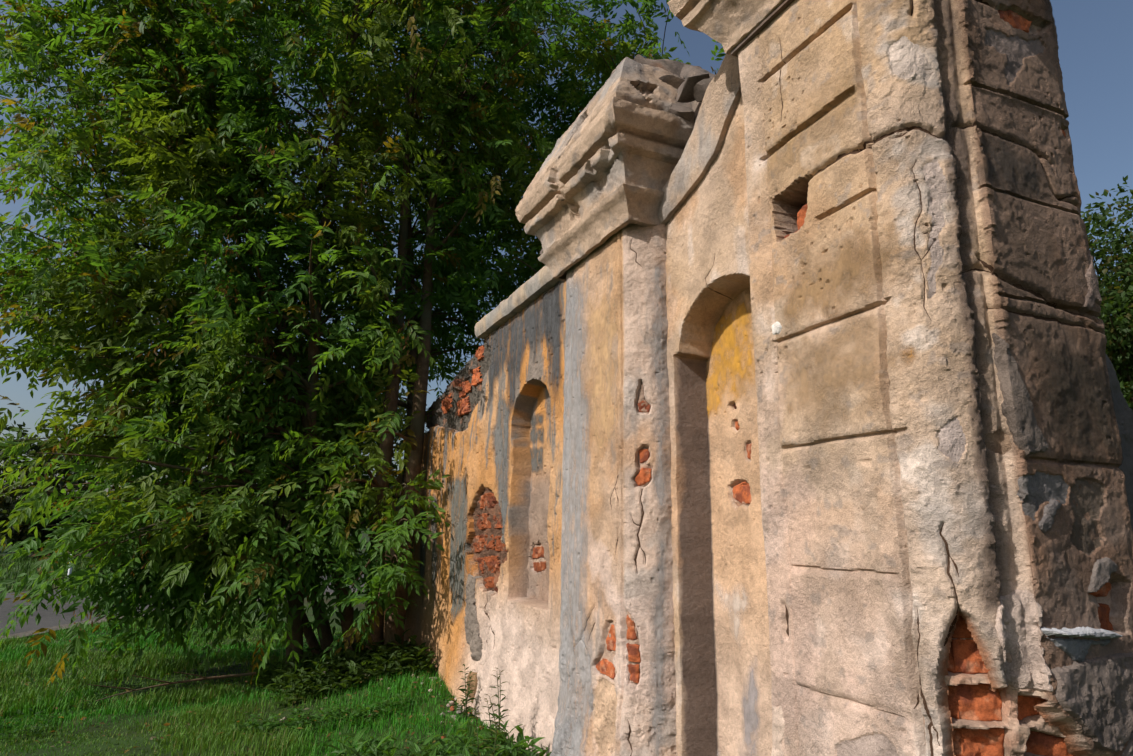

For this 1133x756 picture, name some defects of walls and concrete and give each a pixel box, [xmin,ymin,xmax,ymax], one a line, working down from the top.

crack [814,125,1048,176]
hole [784,202,808,238]
crack [912,160,936,320]
spalling [425,343,492,432]
spalling [637,382,651,413]
spalling [470,488,508,594]
crack [610,476,646,574]
spalling [635,447,652,487]
spalling [732,481,752,507]
peeling [592,611,641,756]
crack [913,523,960,756]
spalling [944,616,1075,756]